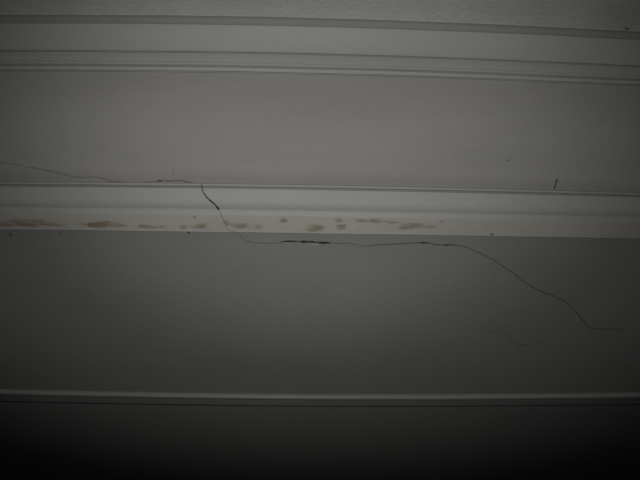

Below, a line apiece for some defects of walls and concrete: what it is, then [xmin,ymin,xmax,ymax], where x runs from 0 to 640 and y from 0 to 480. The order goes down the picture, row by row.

crack [147,170,626,330]